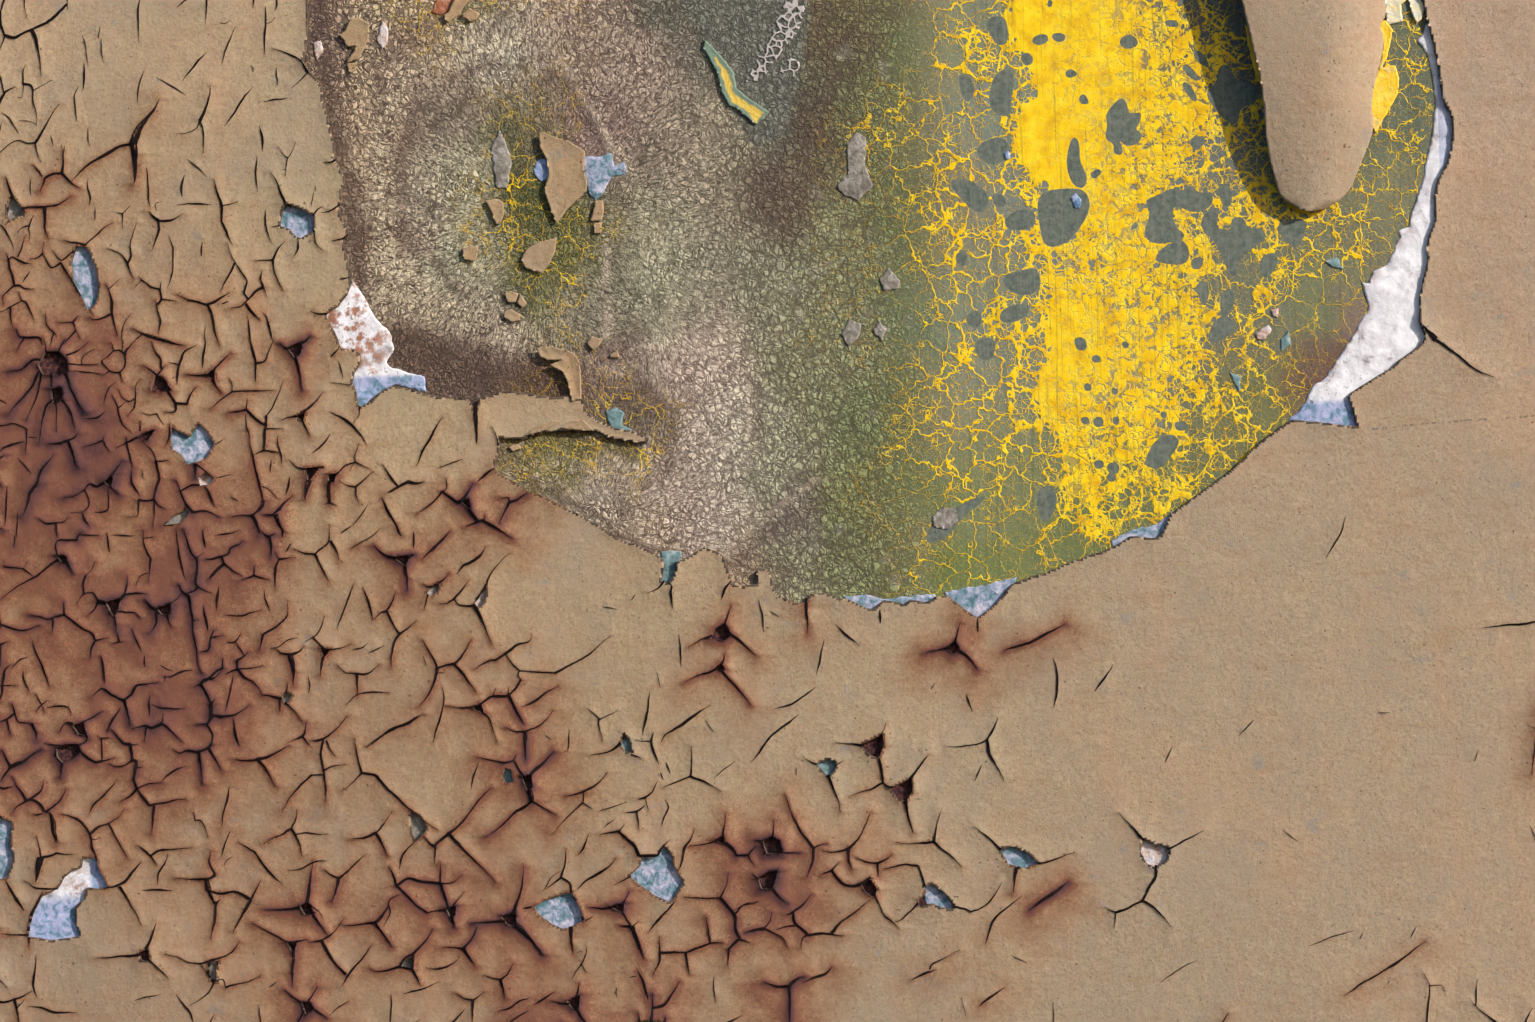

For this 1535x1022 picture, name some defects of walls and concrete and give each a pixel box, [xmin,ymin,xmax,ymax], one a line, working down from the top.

peeling [72,246,98,310]
peeling [304,0,1452,617]
crack [1421,323,1493,377]
peeling [171,424,214,486]
crack [0,0,1075,1022]
corrosion [0,144,899,1022]
crack [1484,620,1535,628]
peeling [29,857,107,940]
peeling [535,893,584,929]
peeling [631,847,683,902]
crack [1105,813,1204,927]
crack [1345,927,1533,1022]